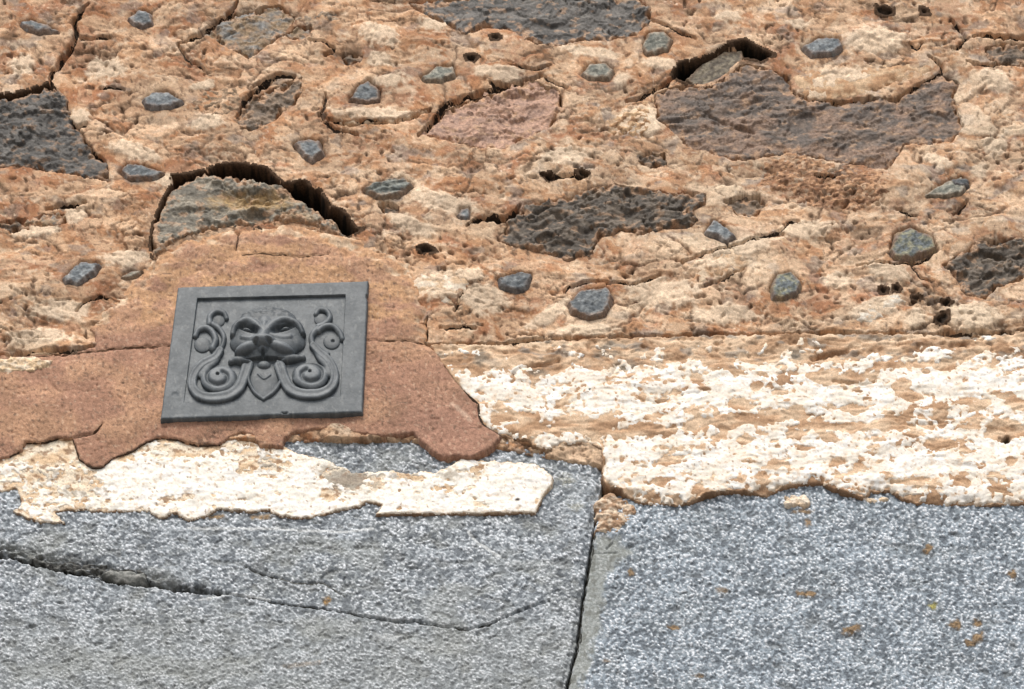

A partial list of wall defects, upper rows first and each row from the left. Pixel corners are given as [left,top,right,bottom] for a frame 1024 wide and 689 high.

crack [49,11,108,89]
crack [320,65,563,135]
crack [74,125,104,163]
crack [236,236,329,258]
flaking render [444,336,1024,507]
flaking render [0,440,552,524]
spalling [11,556,152,588]
crack [64,571,130,586]
crack [245,567,500,632]
crack [567,495,603,689]